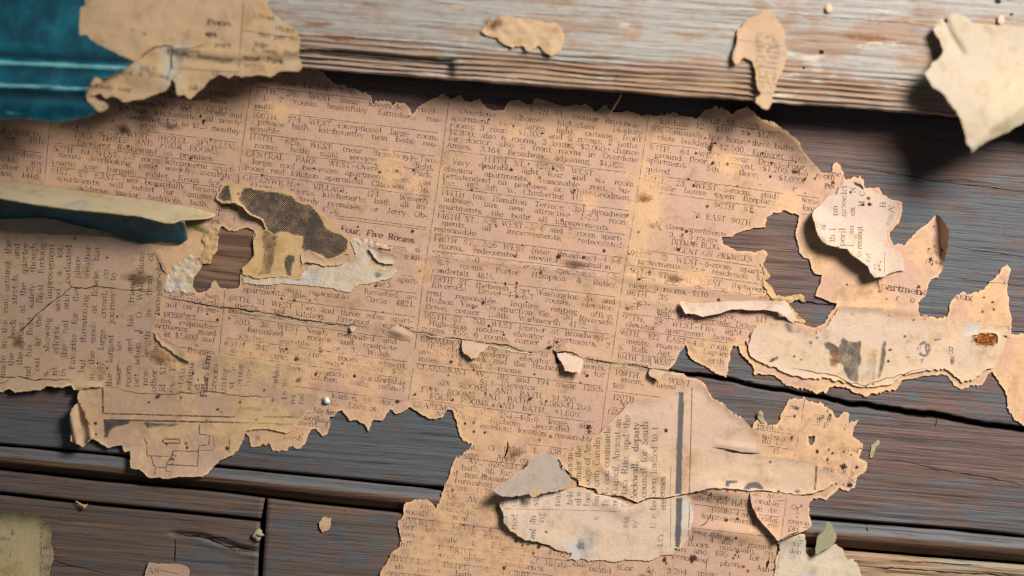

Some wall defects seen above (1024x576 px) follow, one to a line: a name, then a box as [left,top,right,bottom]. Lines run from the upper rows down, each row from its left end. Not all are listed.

peeling [199,227,219,264]
peeling [761,264,806,323]
crack [1,255,1024,432]
rust [972,332,1007,346]